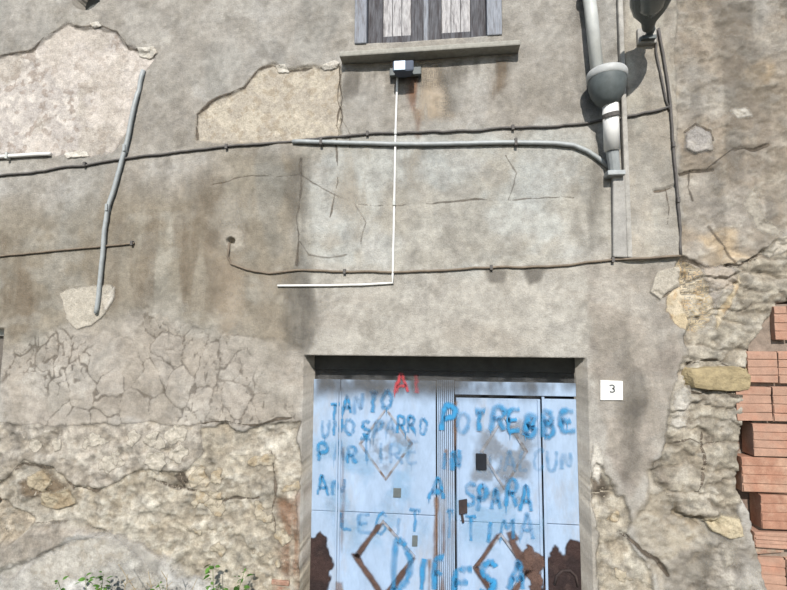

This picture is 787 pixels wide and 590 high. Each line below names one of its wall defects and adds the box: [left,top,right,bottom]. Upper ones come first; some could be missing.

spalling [0,21,157,158]
crack [221,158,315,266]
spalling [195,60,343,144]
crack [330,76,343,216]
crack [654,123,769,222]
crack [679,189,787,269]
peeling [102,288,114,311]
spalling [651,260,741,332]
peeling [672,387,690,429]
spalling [0,417,302,590]
spalling [590,443,669,590]
peeling [703,515,744,539]